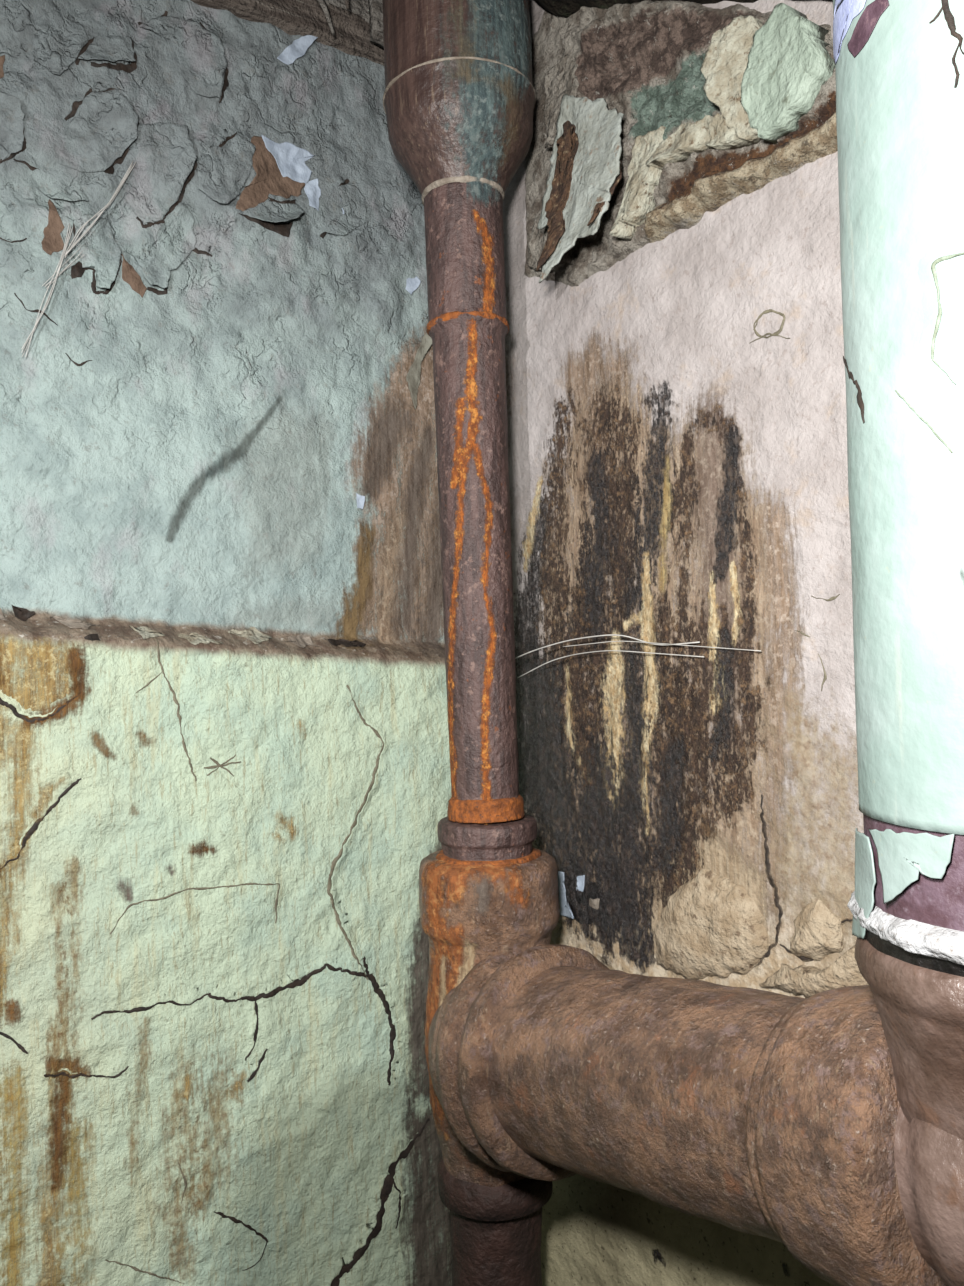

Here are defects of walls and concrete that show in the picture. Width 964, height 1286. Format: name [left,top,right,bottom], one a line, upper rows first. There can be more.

peeling [27,10,228,98]
peeling [27,89,321,298]
spalling [524,0,889,287]
leakage [337,328,445,658]
crack [0,687,80,724]
corrosion [0,637,90,1022]
crack [86,679,405,1087]
leakage [514,337,858,975]
crack [754,795,813,967]
peeling [852,828,955,939]
corrosion [0,922,90,1286]
crack [324,1109,430,1286]